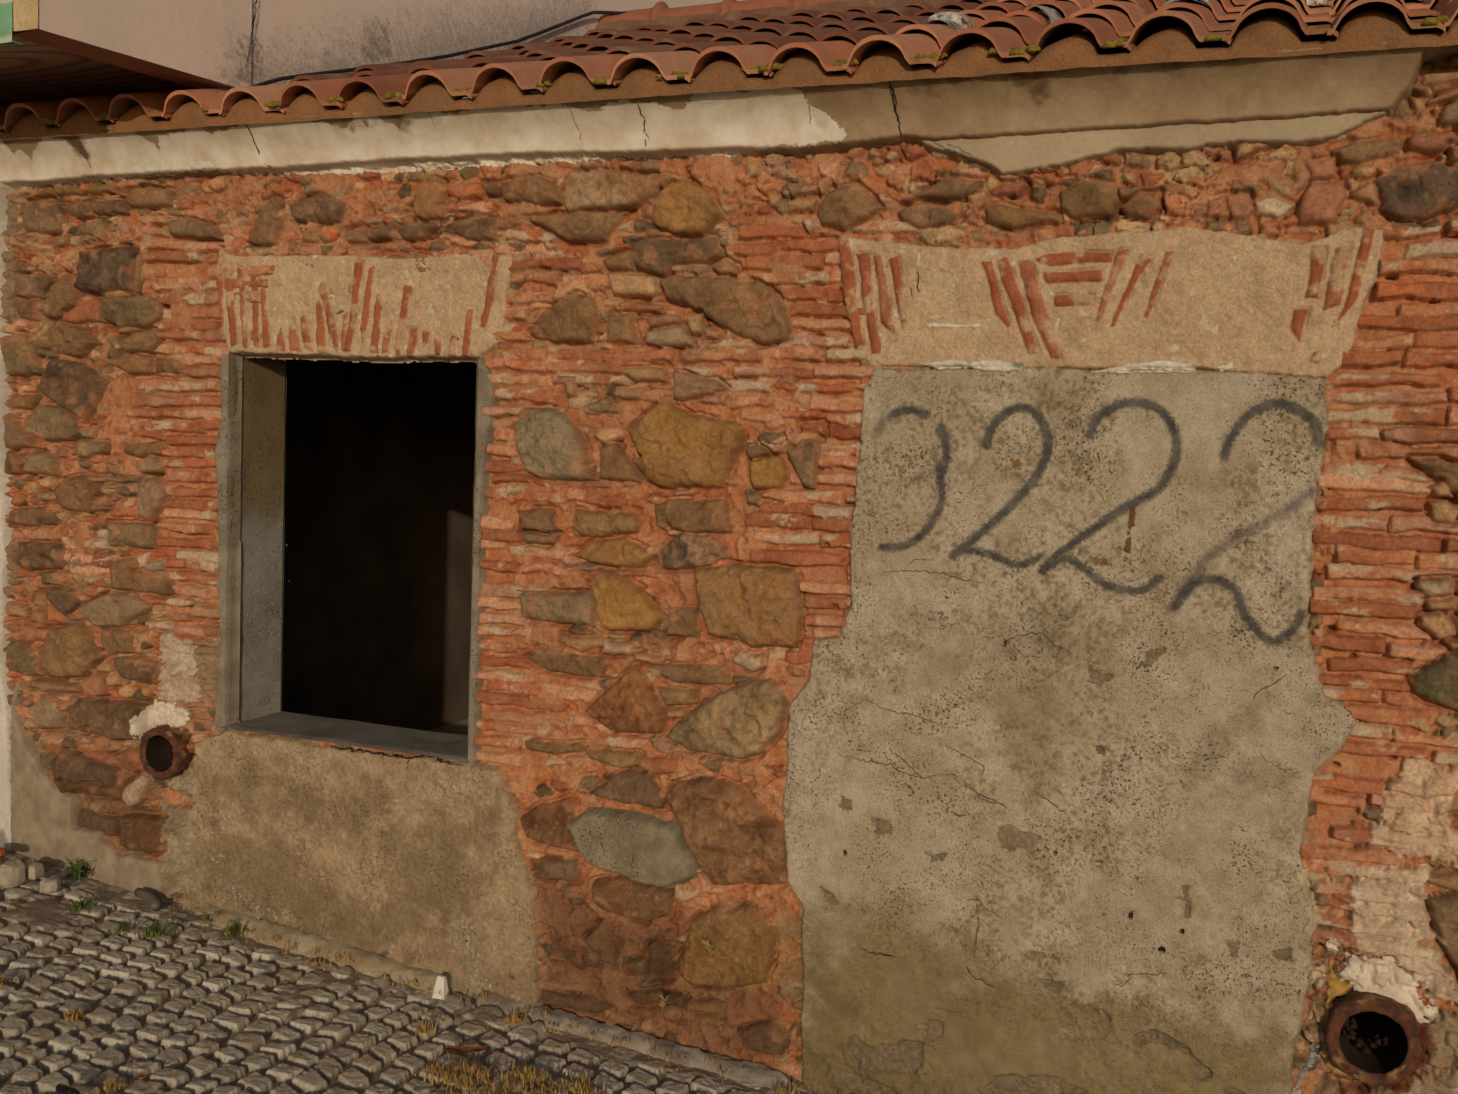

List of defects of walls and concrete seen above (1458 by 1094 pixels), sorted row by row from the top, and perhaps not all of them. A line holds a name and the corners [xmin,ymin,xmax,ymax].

crack [245,0,257,68]
peeling [0,87,847,190]
crack [888,81,973,163]
corrosion [1354,999,1433,1094]